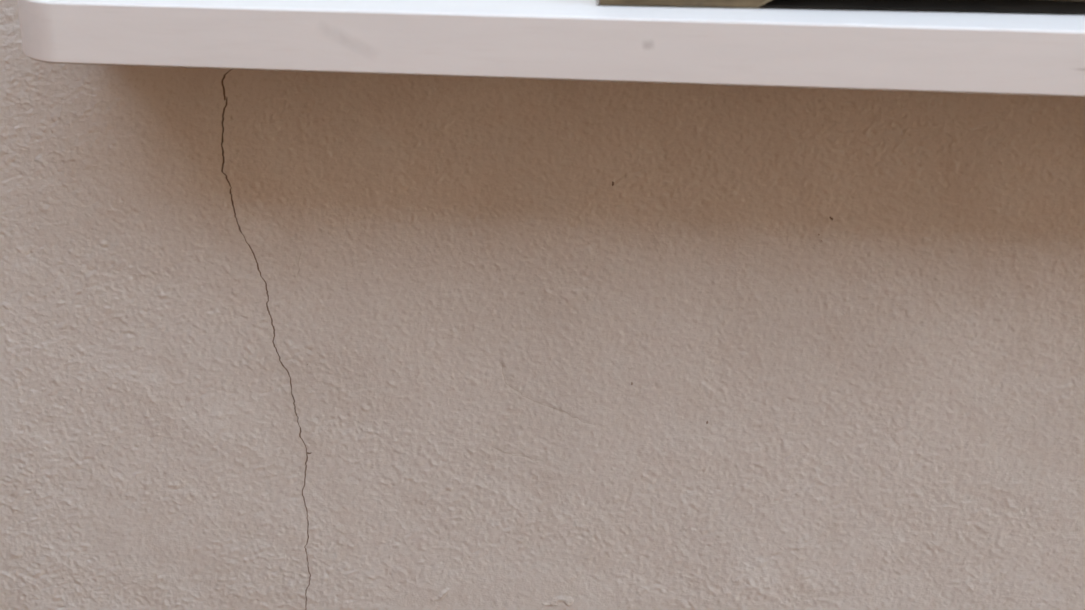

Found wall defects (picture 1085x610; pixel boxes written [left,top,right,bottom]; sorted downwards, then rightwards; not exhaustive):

crack [221,69,312,610]